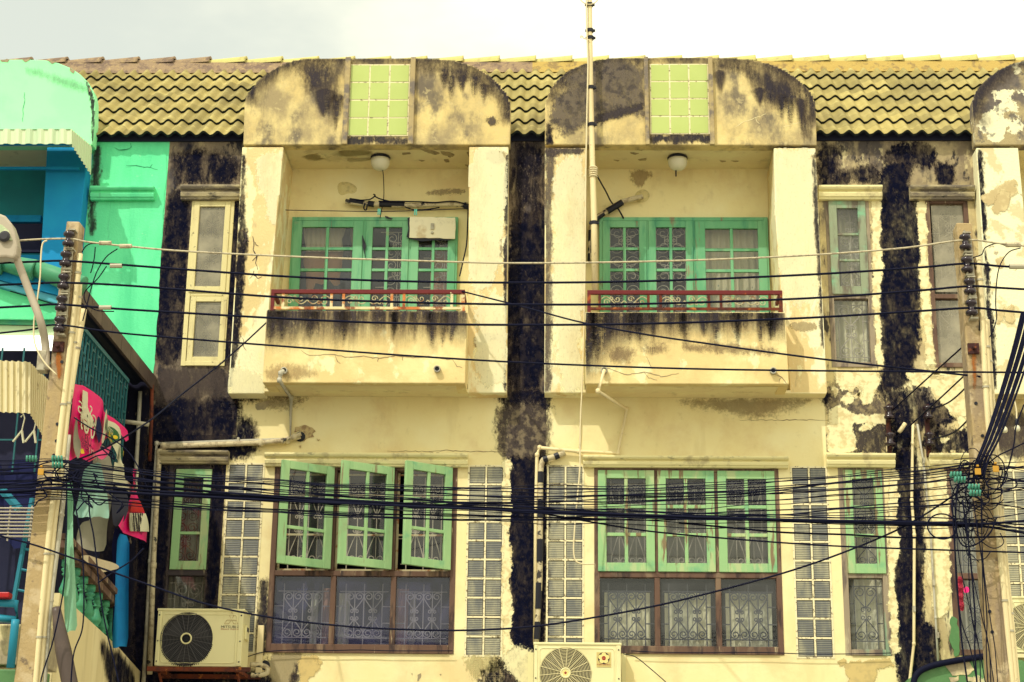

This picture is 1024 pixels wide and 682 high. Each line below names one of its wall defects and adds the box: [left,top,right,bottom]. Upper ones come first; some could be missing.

water stain [246,58,510,126]
peeling [981,180,1018,214]
water stain [266,310,468,342]
water stain [494,58,710,653]
water stain [585,311,785,368]
water stain [101,147,301,682]
water stain [812,141,969,682]